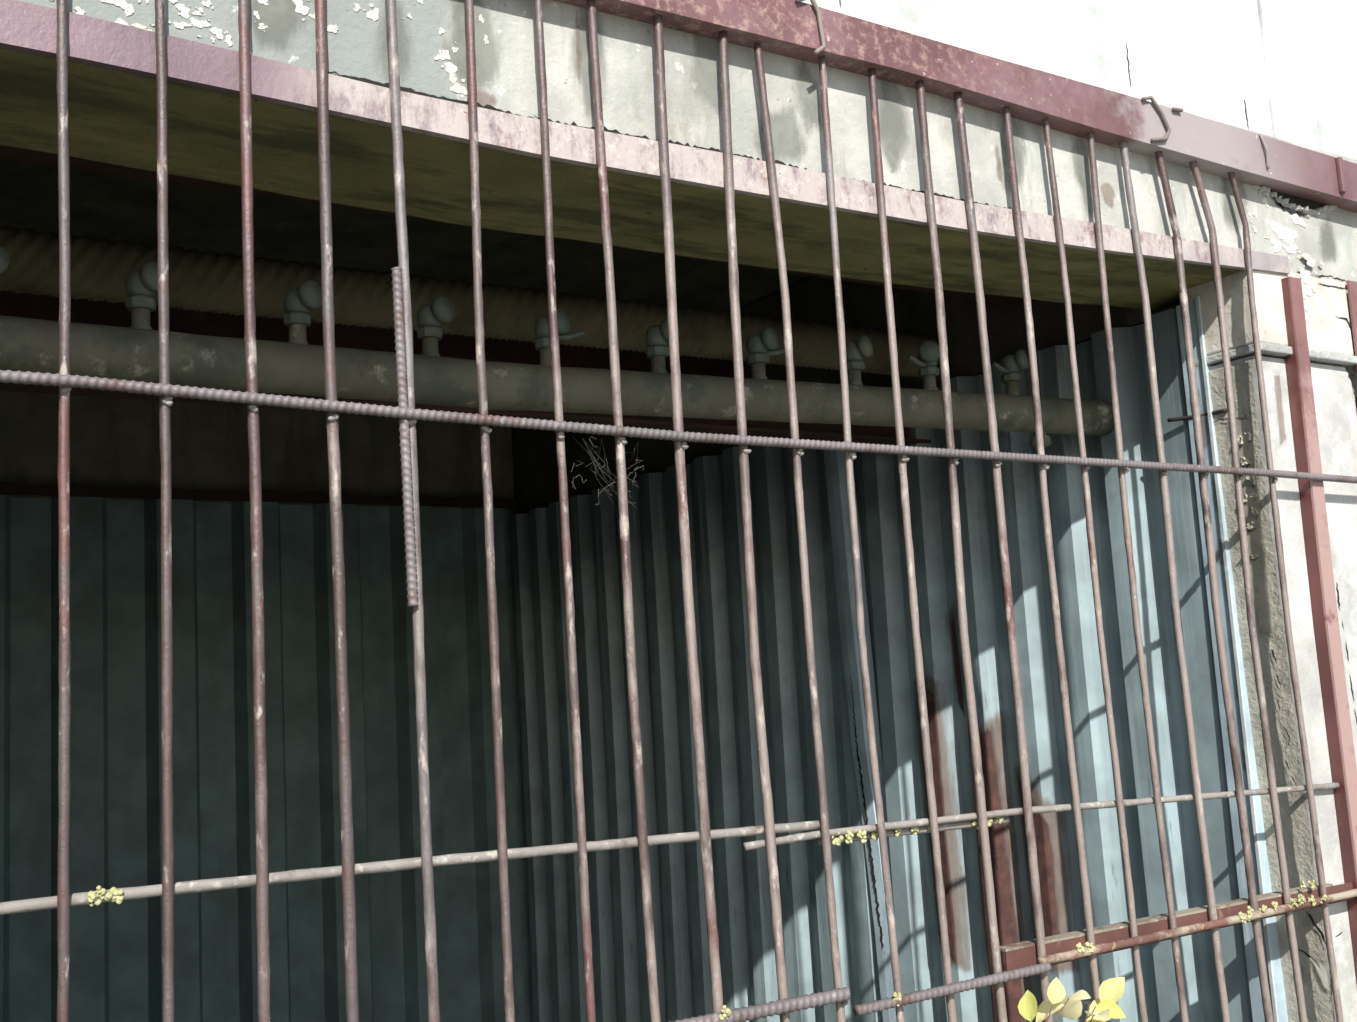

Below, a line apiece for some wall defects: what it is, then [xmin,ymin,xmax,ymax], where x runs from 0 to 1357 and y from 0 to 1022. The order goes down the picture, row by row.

peeling [347,3,379,22]
peeling [434,27,468,96]
spalling [1248,185,1338,317]
corrosion [915,677,966,968]
corrosion [951,614,1070,1022]